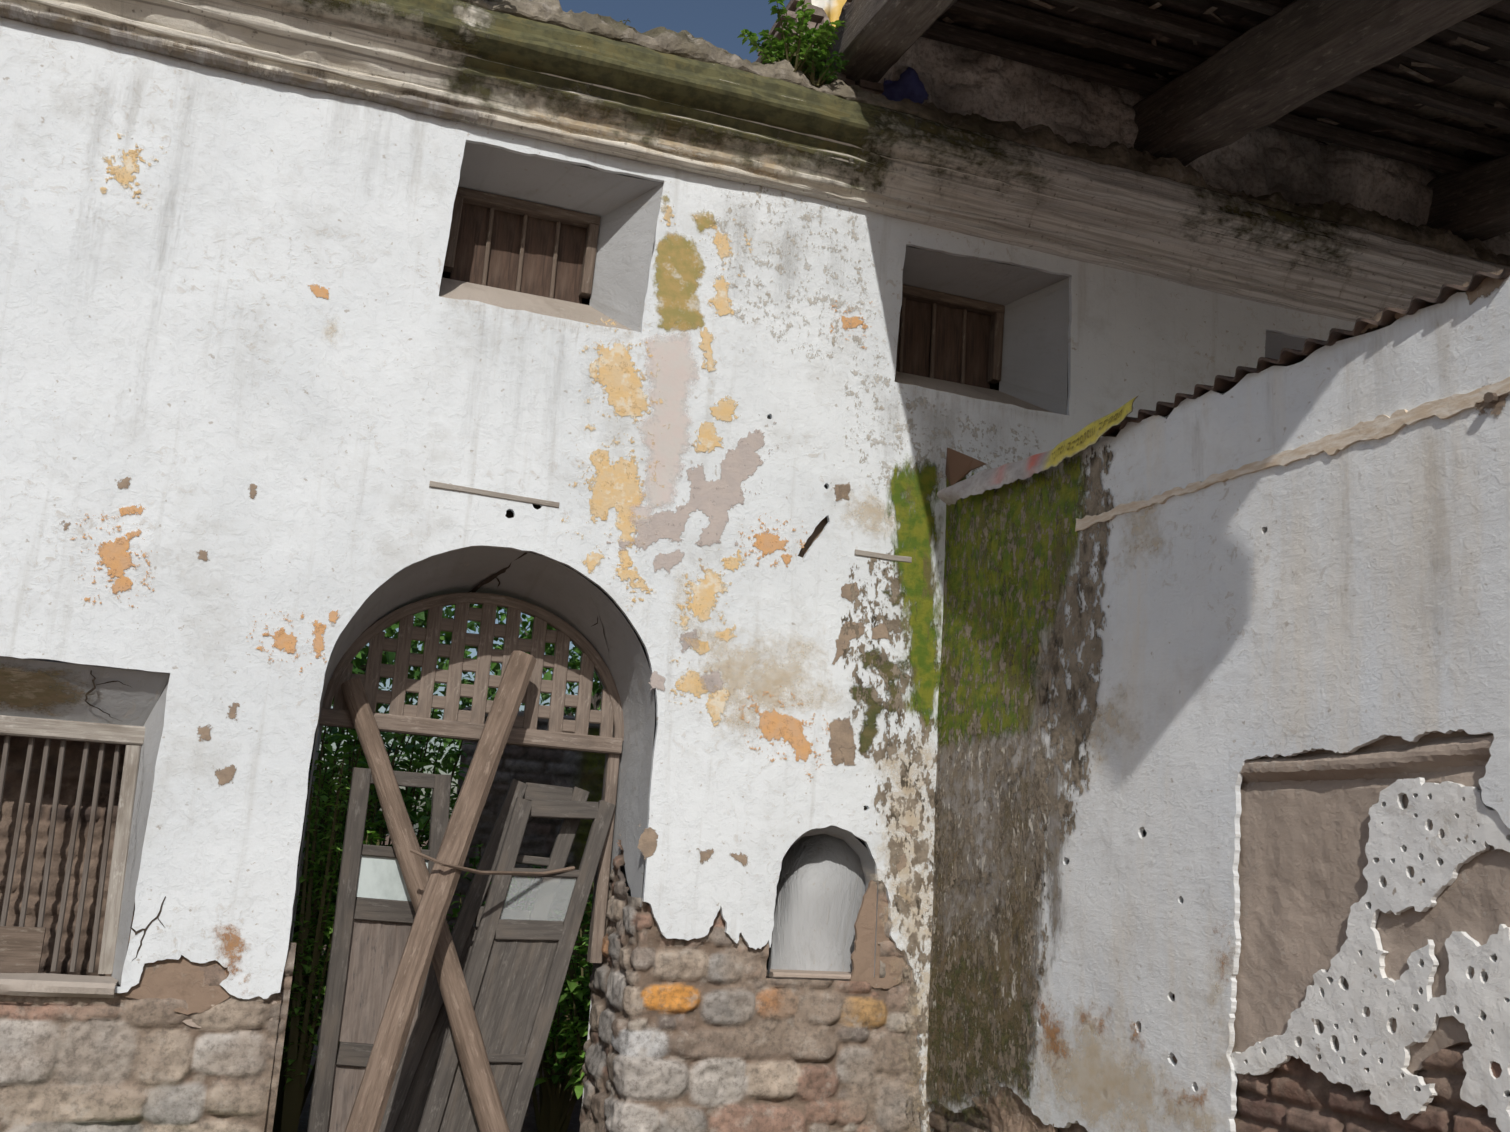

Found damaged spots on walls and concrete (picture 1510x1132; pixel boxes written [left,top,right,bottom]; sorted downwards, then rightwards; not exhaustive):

leakage [0,0,1044,191]
flaking render [91,130,167,208]
flaking render [1462,270,1504,305]
flaking render [117,477,131,489]
peeling [59,504,158,608]
crack [85,670,131,720]
peeling [246,609,339,675]
flaking render [561,186,1114,1132]
leakage [926,466,1078,1110]
crack [130,896,166,960]
flaking render [1231,730,1510,1132]
flaking render [0,926,297,1132]